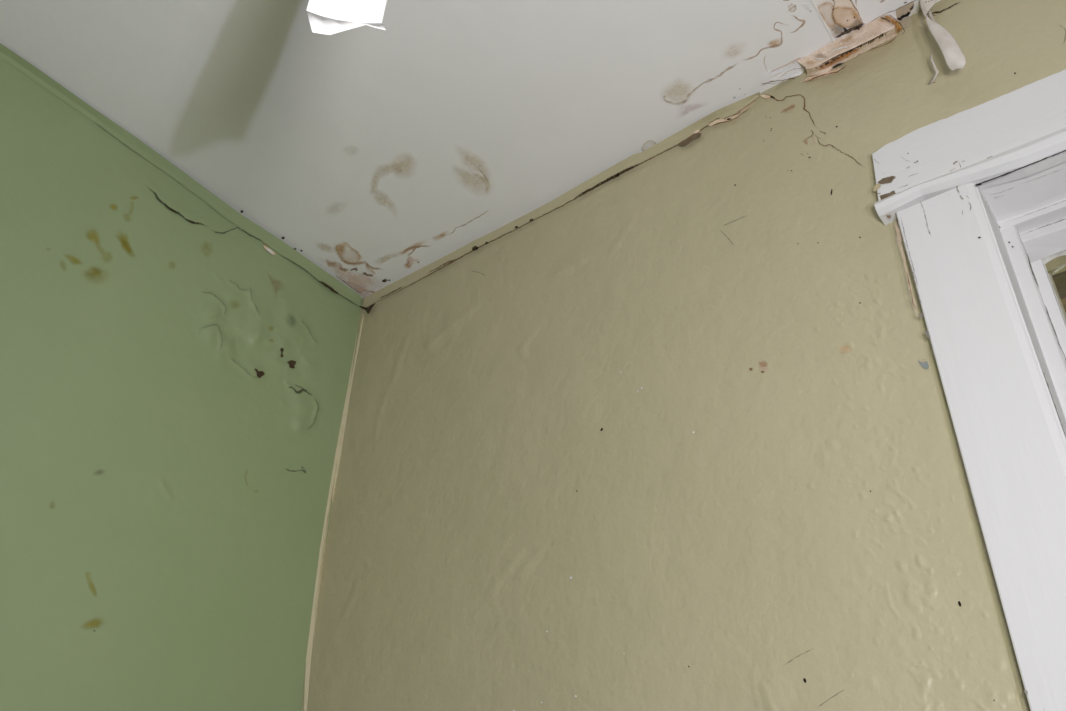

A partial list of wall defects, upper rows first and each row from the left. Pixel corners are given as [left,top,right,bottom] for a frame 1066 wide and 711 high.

peeling [920,0,966,84]
crack [769,94,878,164]
crack [150,189,260,240]
crack [954,150,1066,221]
damp [329,261,390,293]